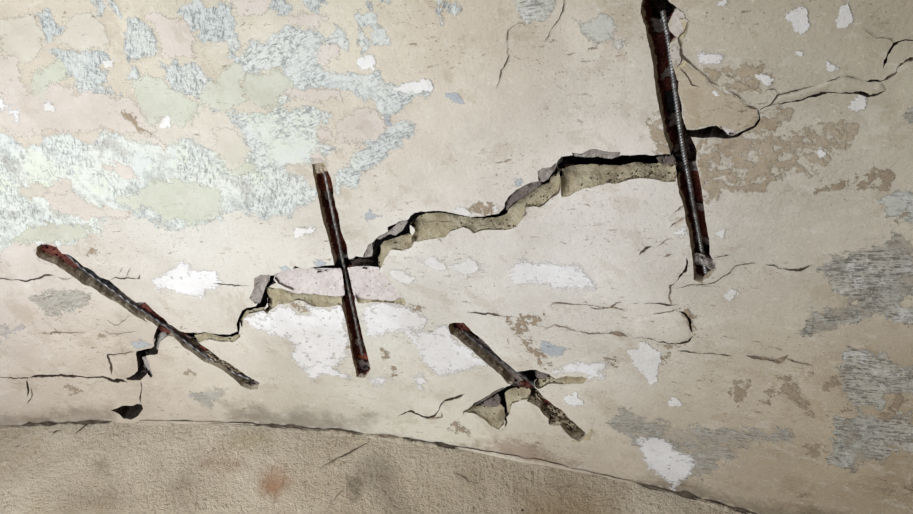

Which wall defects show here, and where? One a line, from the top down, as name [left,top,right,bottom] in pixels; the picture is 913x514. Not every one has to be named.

peeling [0,0,433,266]
peeling [514,0,556,24]
crack [678,25,913,139]
crack [0,274,70,282]
crack [188,149,679,337]
spalling [194,111,678,342]
crack [546,206,809,365]
crack [0,320,755,514]
spalling [466,313,587,430]
peeling [605,346,913,481]